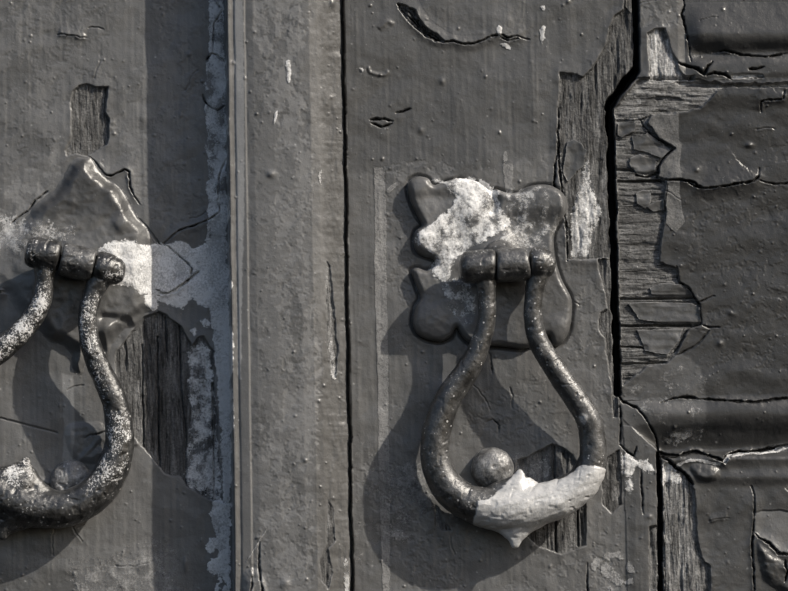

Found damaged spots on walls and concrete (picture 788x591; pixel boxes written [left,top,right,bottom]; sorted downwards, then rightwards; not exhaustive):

crack [411,19,517,45]
peeling [66,85,109,156]
peeling [558,0,788,417]
crack [604,0,788,591]
peeling [115,313,223,500]
peeling [649,462,710,591]
peeling [753,510,788,555]